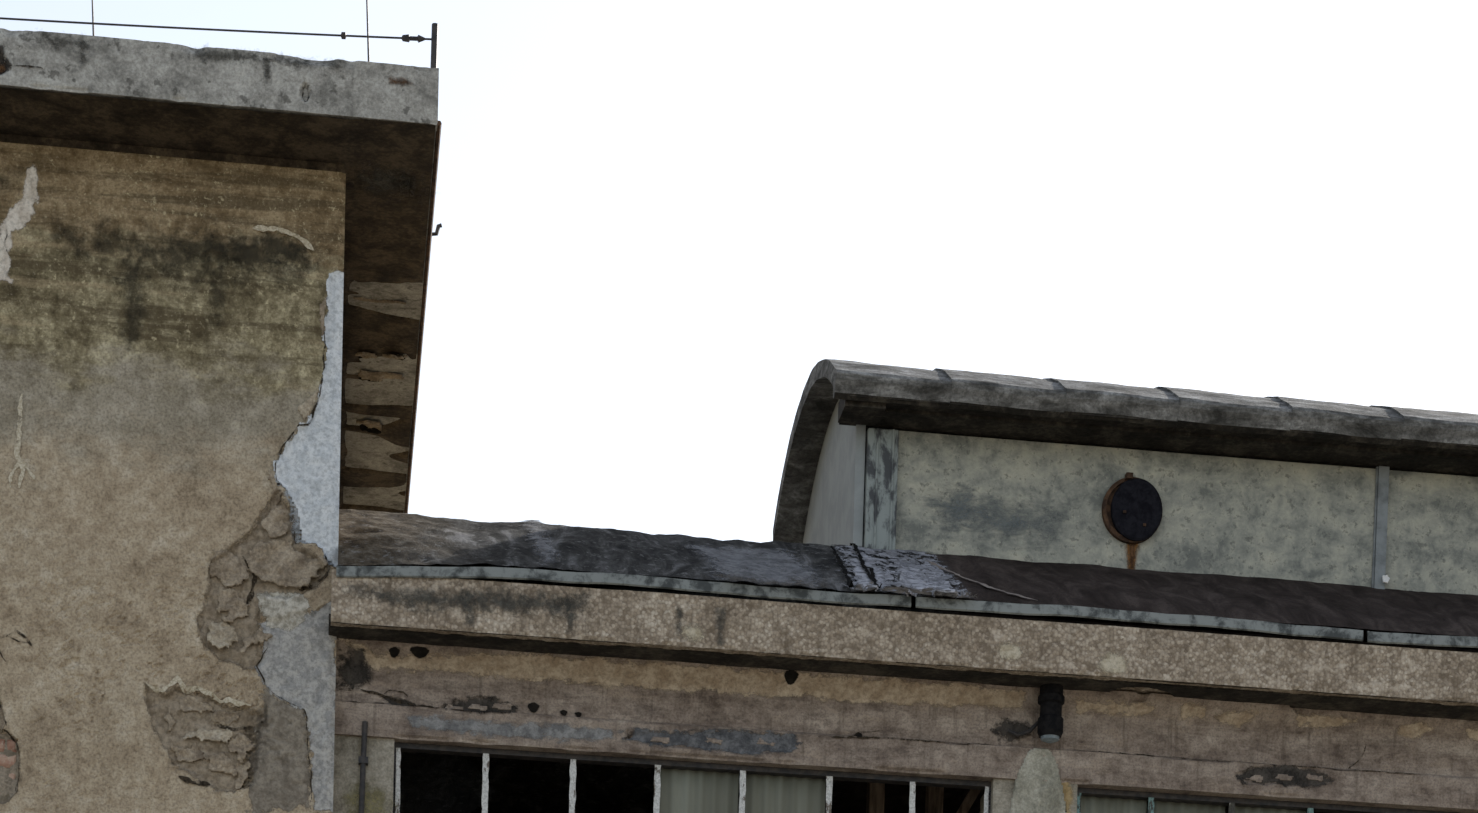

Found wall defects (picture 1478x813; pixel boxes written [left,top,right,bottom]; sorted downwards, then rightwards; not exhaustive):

crack [0,166,39,284]
flaking render [253,225,314,262]
damp [55,224,309,342]
peeling [144,270,1035,813]
rust [1126,544,1139,569]
crack [0,630,32,662]
peeling [1236,765,1333,788]